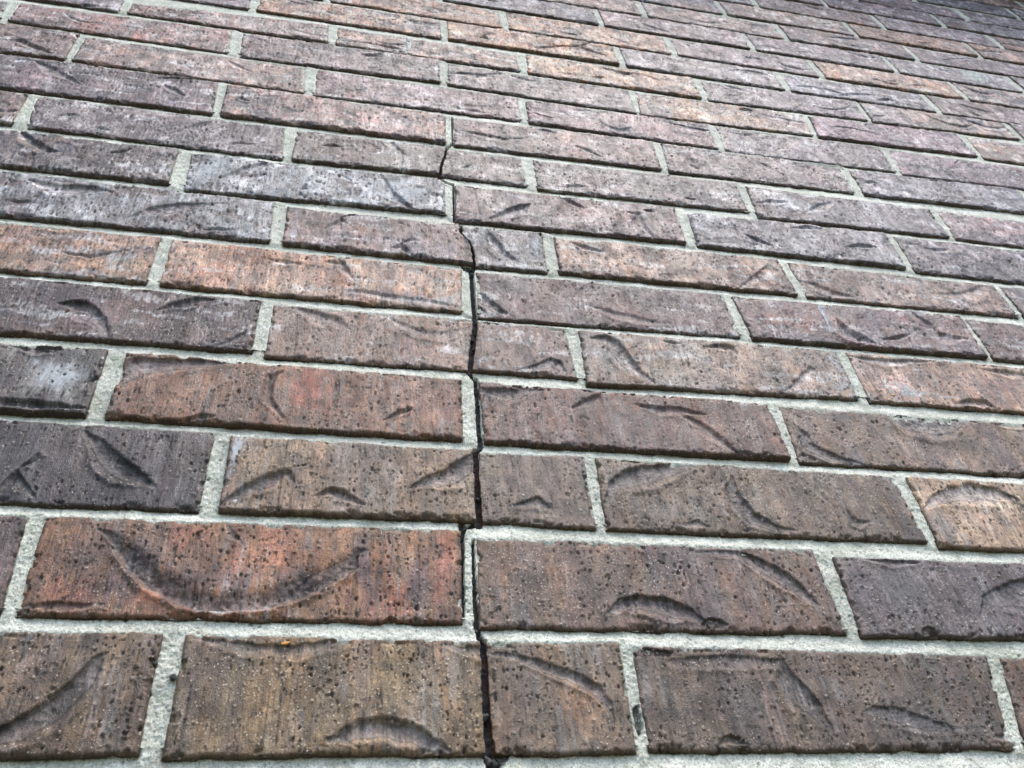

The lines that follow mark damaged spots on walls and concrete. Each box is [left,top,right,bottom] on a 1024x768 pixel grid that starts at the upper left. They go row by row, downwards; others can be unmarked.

crack [437,121,499,768]